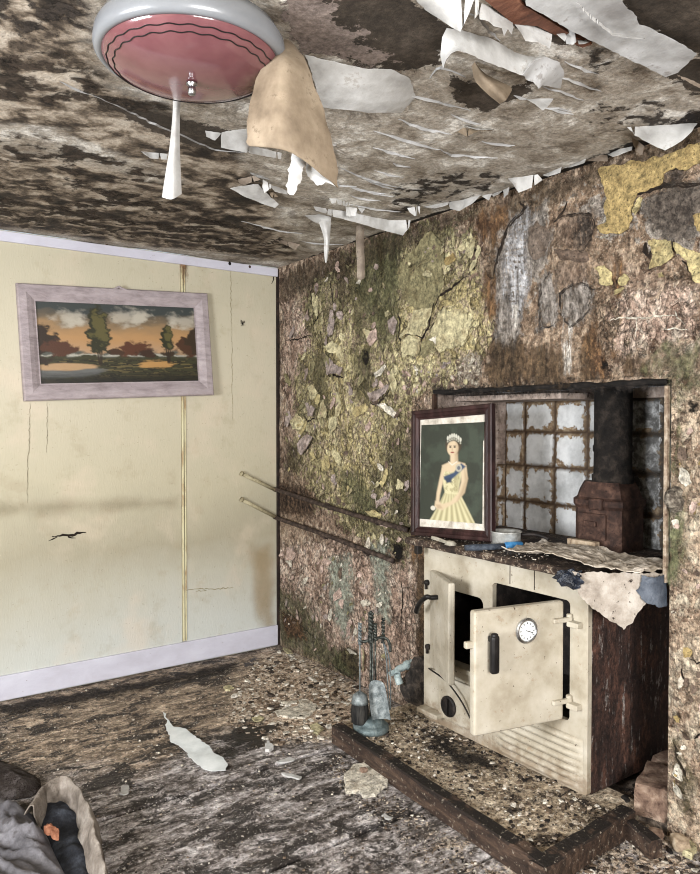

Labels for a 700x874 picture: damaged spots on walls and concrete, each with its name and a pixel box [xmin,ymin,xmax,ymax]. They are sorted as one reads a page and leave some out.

mould [0,0,171,113]
mould [0,134,291,256]
crack [398,201,527,353]
peeling [493,143,700,348]
crack [49,532,86,541]